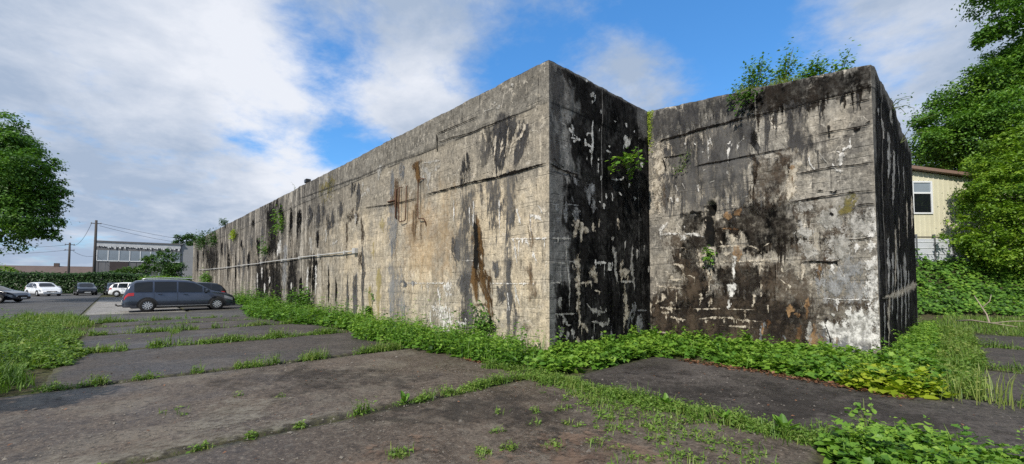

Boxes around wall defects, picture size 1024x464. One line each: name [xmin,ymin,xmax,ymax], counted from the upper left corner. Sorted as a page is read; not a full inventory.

corrosion [387,160,427,236]
damp [196,65,918,352]
corrosion [470,217,494,333]